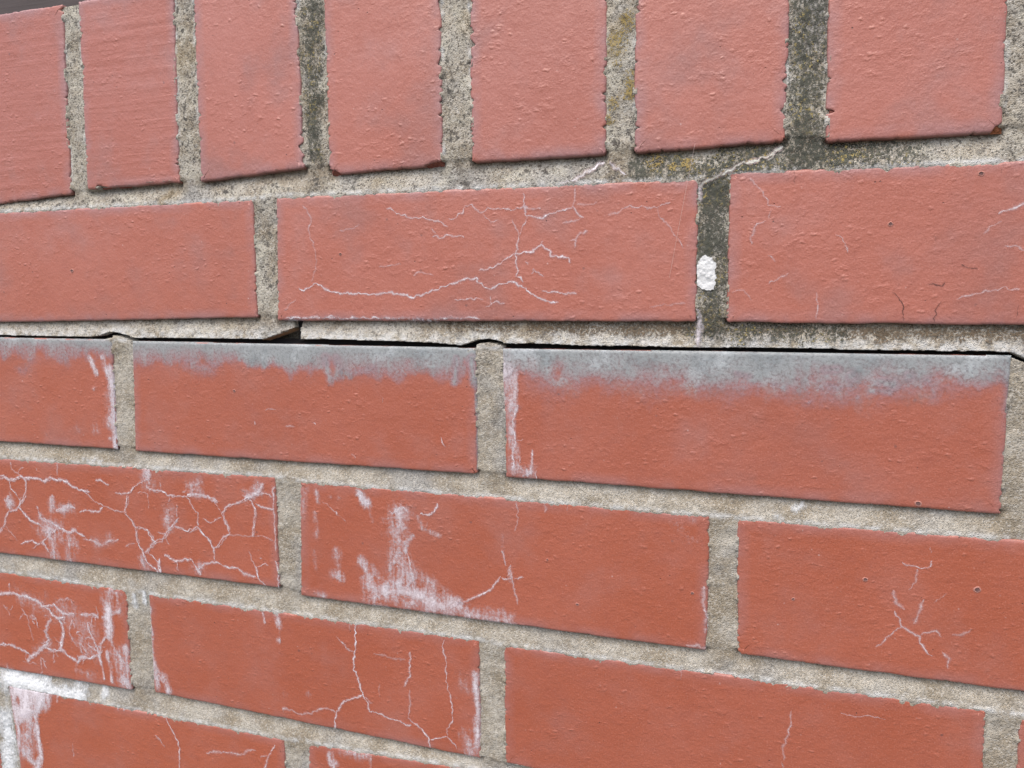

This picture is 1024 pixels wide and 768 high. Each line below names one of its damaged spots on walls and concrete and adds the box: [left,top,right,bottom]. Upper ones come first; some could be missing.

water stain [0,337,118,449]
water stain [133,341,477,407]
crack [0,320,1024,362]
water stain [443,312,1024,444]
crack [1,476,280,587]
water stain [360,508,508,623]
crack [3,592,96,662]